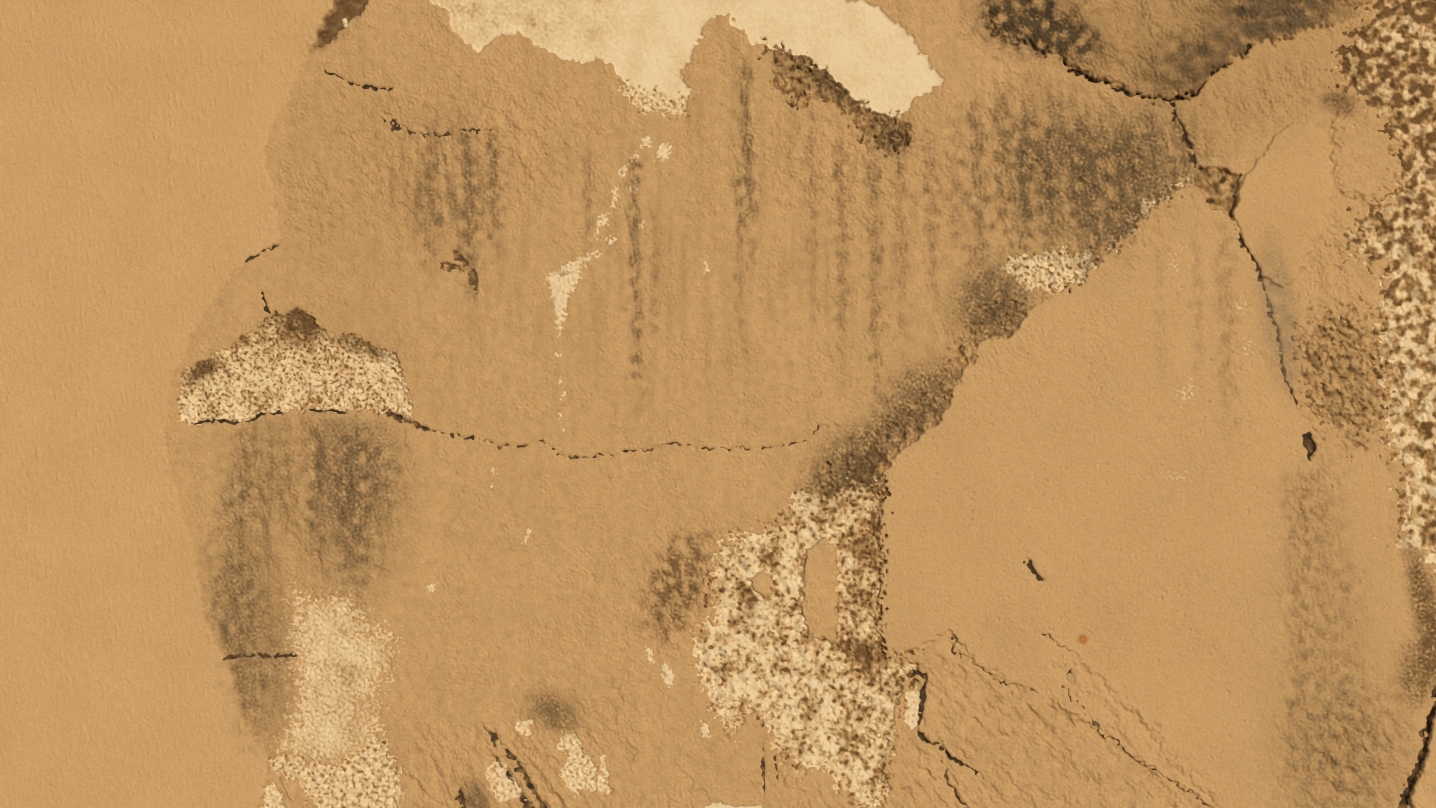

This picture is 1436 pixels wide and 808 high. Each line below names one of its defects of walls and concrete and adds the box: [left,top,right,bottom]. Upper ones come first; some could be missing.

spalling [315,0,368,49]
spalling [429,0,944,157]
crack [194,409,348,425]
spalling [176,308,413,428]
damp [310,427,381,536]
crack [385,410,839,459]
spalling [689,167,1242,808]
crack [1230,217,1298,409]
spalling [1289,0,1436,581]
spalling [261,579,410,808]
crack [910,634,1209,806]
crack [1398,687,1436,808]